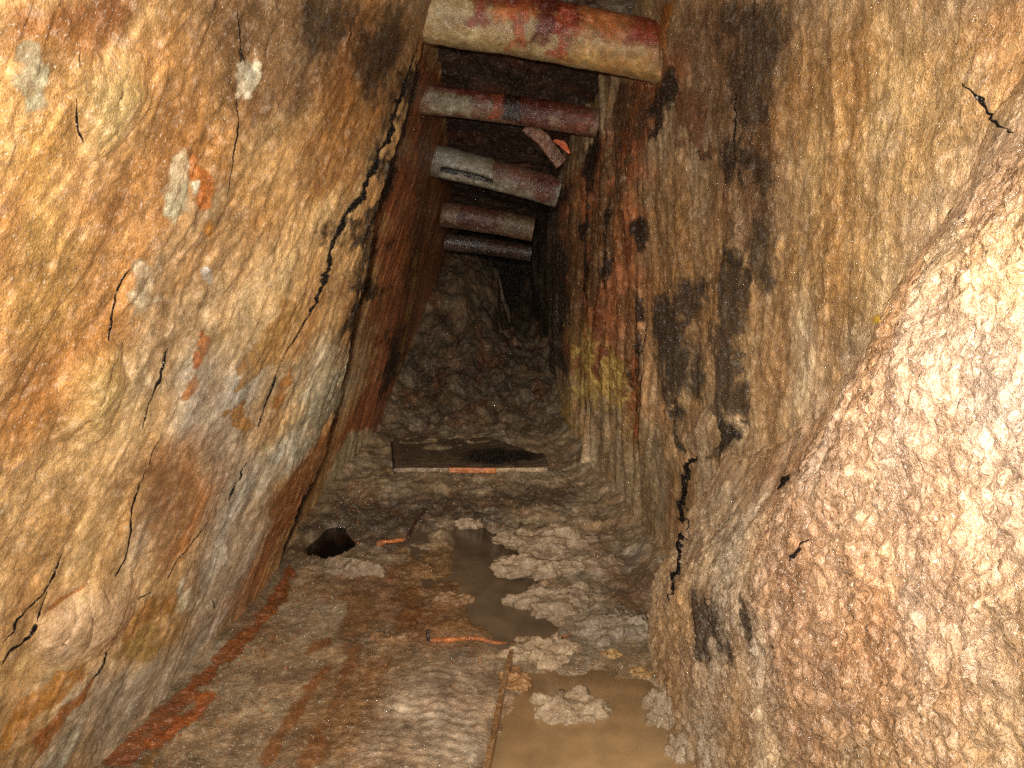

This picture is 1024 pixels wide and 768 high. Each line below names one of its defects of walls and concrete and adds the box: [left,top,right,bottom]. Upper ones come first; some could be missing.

crack [227,11,245,198]
damp [646,67,679,140]
crack [962,83,1013,133]
crack [258,39,420,427]
rust [396,115,435,373]
damp [652,0,786,452]
crack [281,413,336,561]
crack [667,457,697,601]
crack [2,554,62,665]
rust [103,565,297,768]
damp [691,591,731,662]
damp [738,598,752,641]